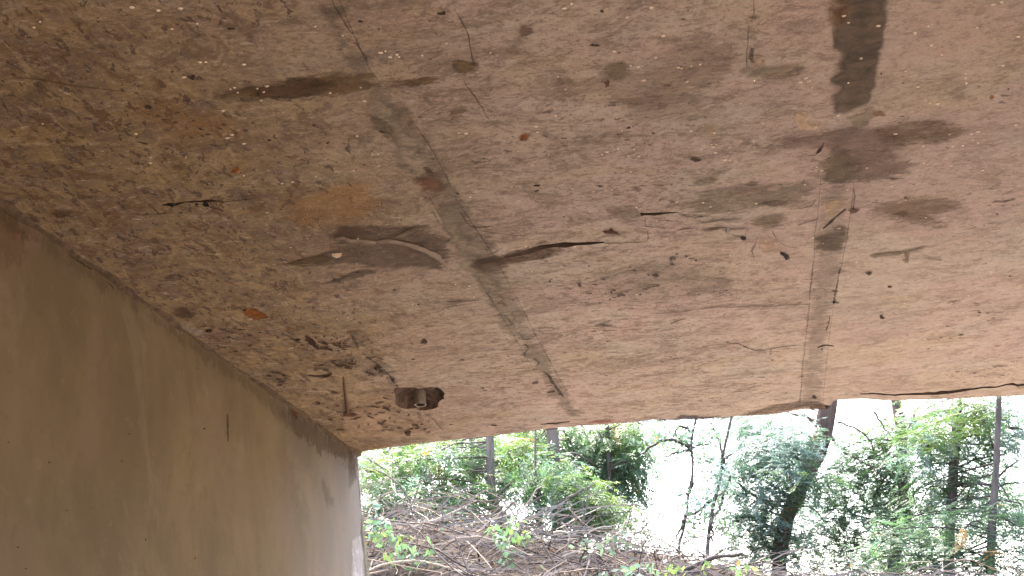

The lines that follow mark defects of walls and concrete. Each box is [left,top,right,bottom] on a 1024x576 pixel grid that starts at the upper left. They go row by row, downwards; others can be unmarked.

leakage [216,74,440,179]
leakage [453,61,477,76]
leakage [756,0,917,183]
leakage [287,204,556,335]
spalling [294,336,445,436]
crack [862,383,1024,396]